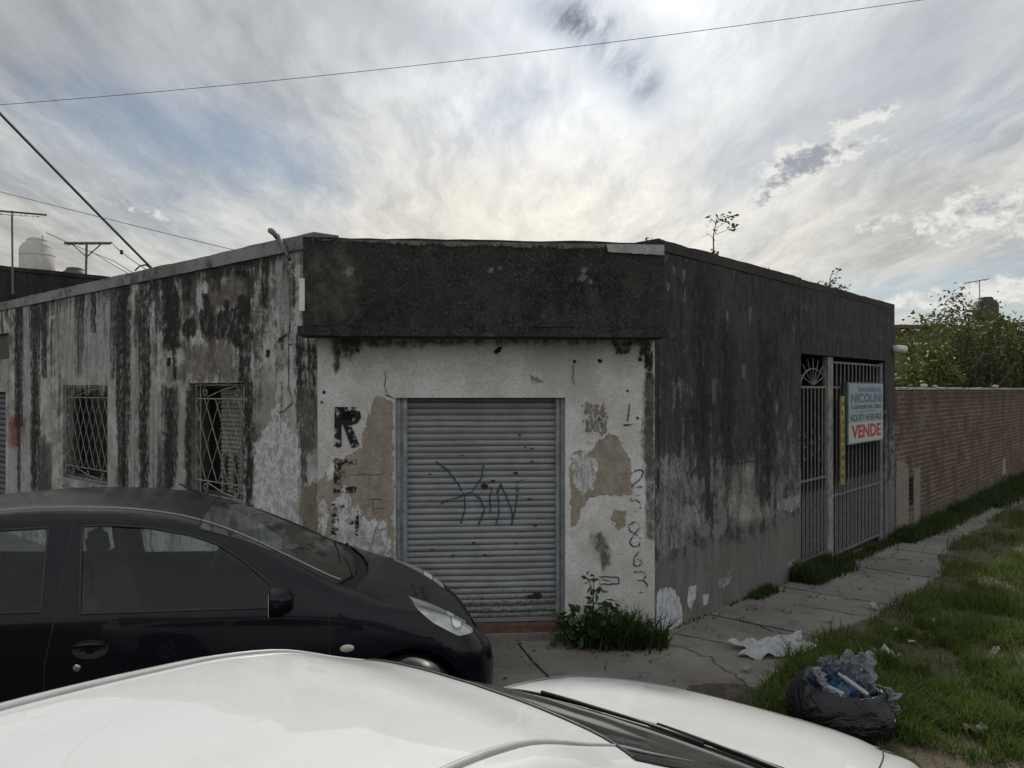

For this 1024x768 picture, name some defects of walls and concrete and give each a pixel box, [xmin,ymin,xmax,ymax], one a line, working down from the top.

water stain [12,302,47,493]
water stain [75,292,96,374]
water stain [109,254,284,507]
water stain [293,334,317,482]
peeling [251,396,396,559]
peeling [569,401,633,530]